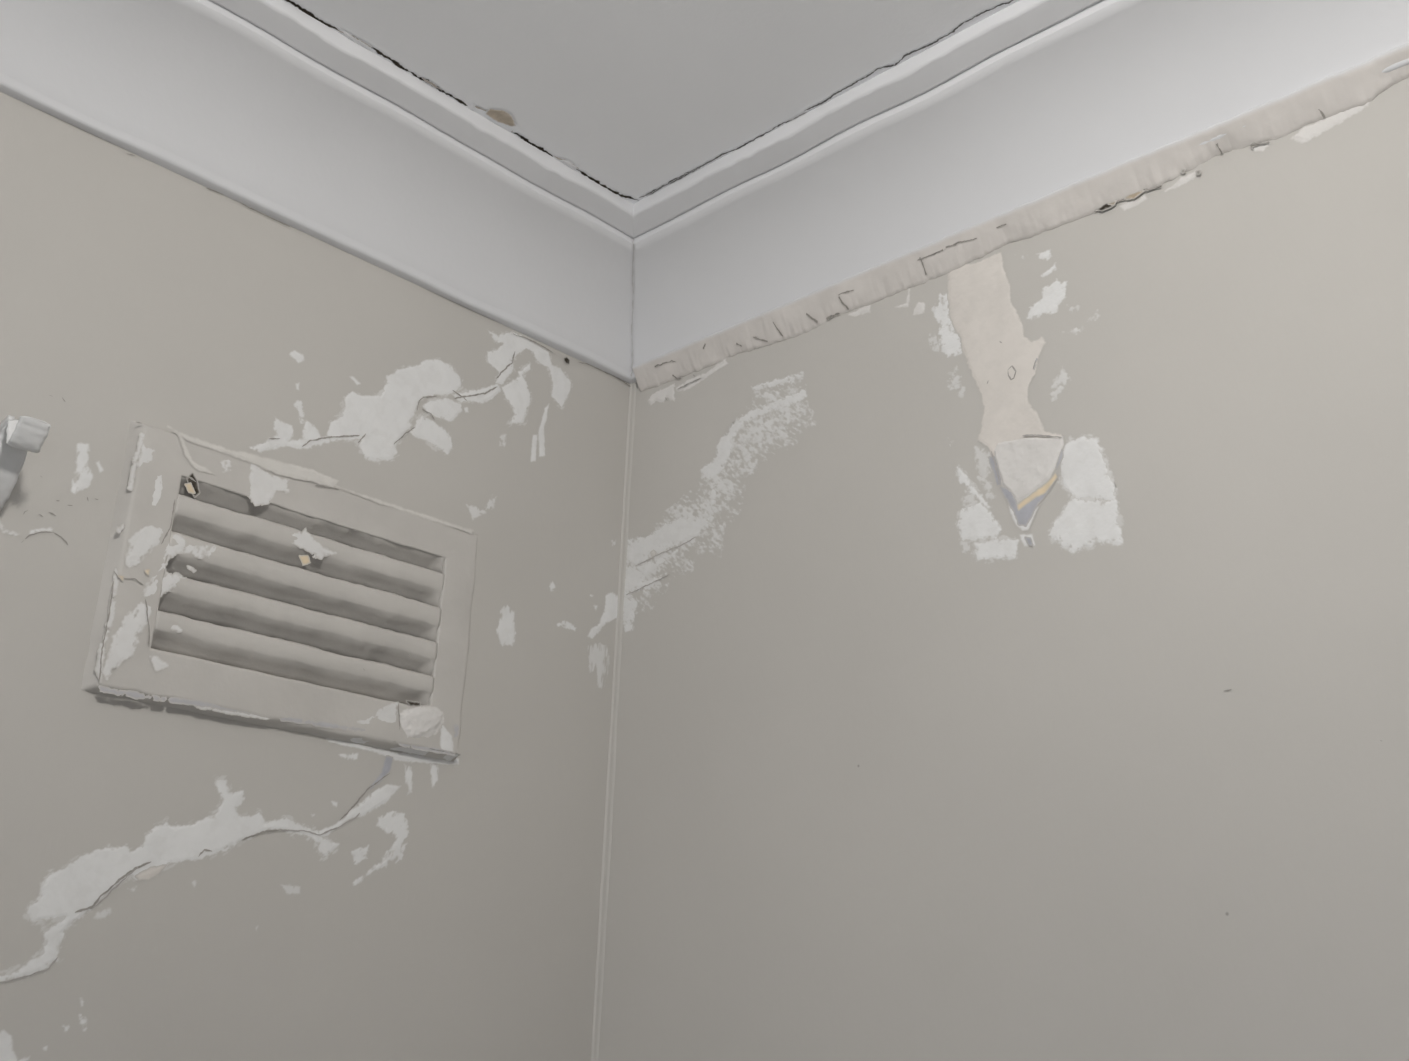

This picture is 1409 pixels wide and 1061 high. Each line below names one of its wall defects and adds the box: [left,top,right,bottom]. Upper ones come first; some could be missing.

crack [284,0,1013,201]
spalling [184,473,200,498]
crack [207,188,290,227]
crack [268,238,854,447]
peeling [647,358,729,406]
crack [587,371,817,689]
crack [918,224,1006,275]
flaking render [947,252,1065,547]
crack [0,704,461,985]